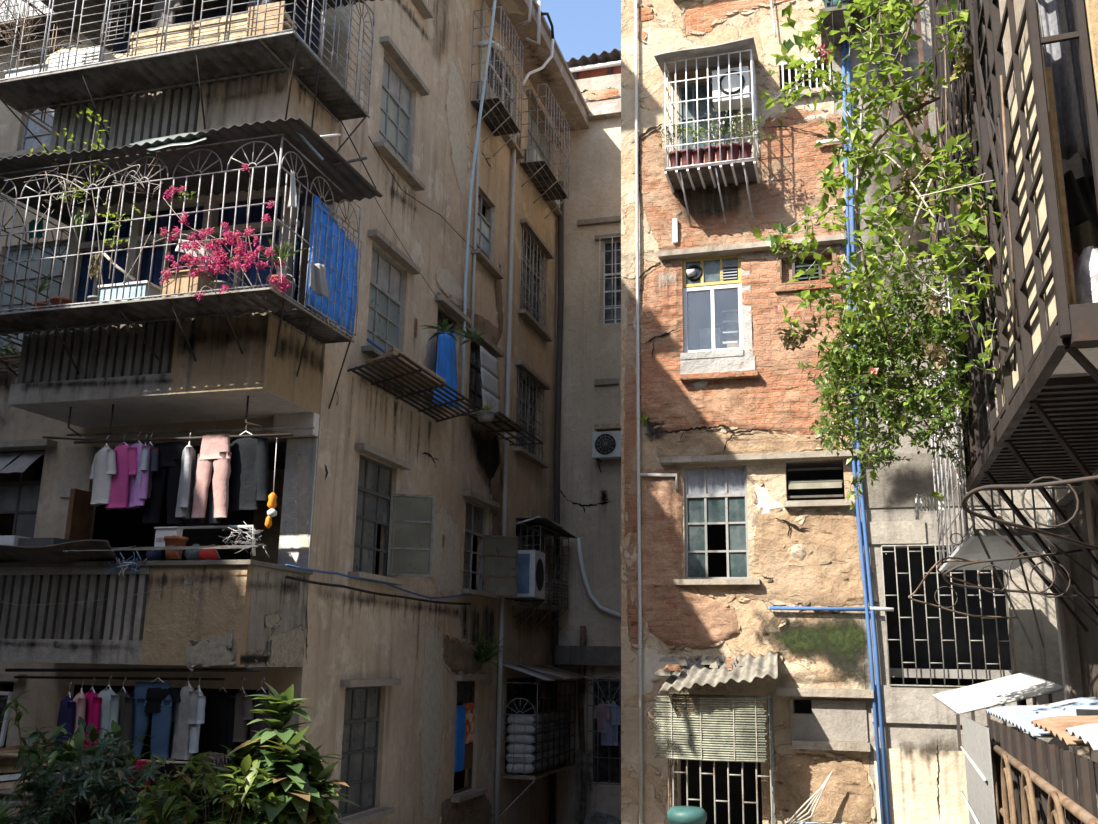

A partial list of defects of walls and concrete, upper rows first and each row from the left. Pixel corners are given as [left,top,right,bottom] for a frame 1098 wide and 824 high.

peeling [637,3,656,44]
peeling [678,0,809,37]
crack [638,124,662,195]
crack [639,263,660,296]
peeling [619,106,878,696]
crack [644,424,780,452]
crack [775,518,811,536]
spalling [185,625,305,672]
leakage [755,610,867,686]